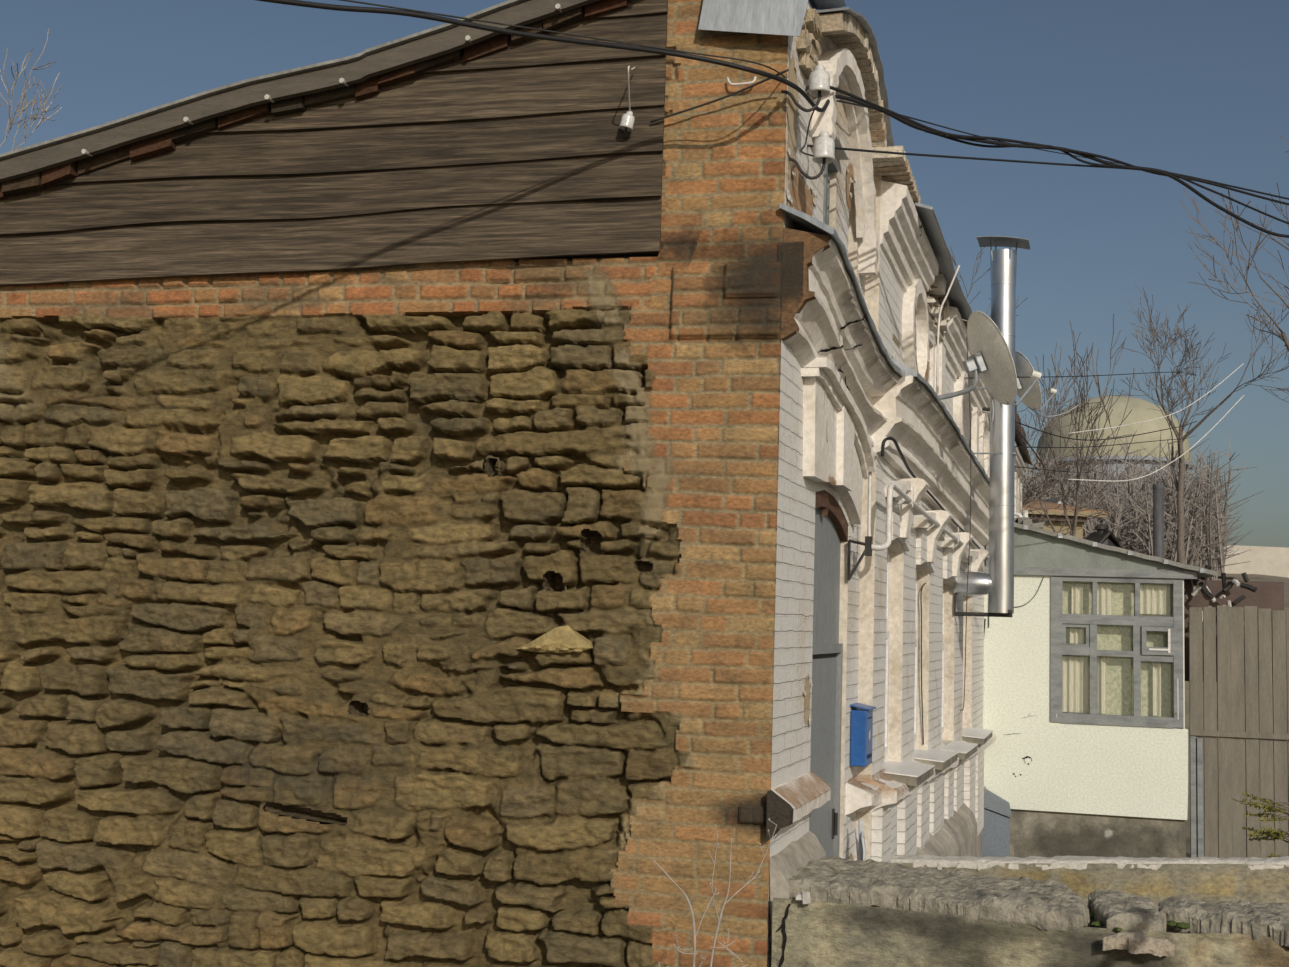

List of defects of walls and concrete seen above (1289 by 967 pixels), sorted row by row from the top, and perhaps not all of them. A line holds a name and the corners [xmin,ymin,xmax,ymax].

spalling [786,9,823,217]
peeling [846,164,856,216]
water stain [718,242,804,336]
crack [818,315,868,404]
crack [776,903,791,967]